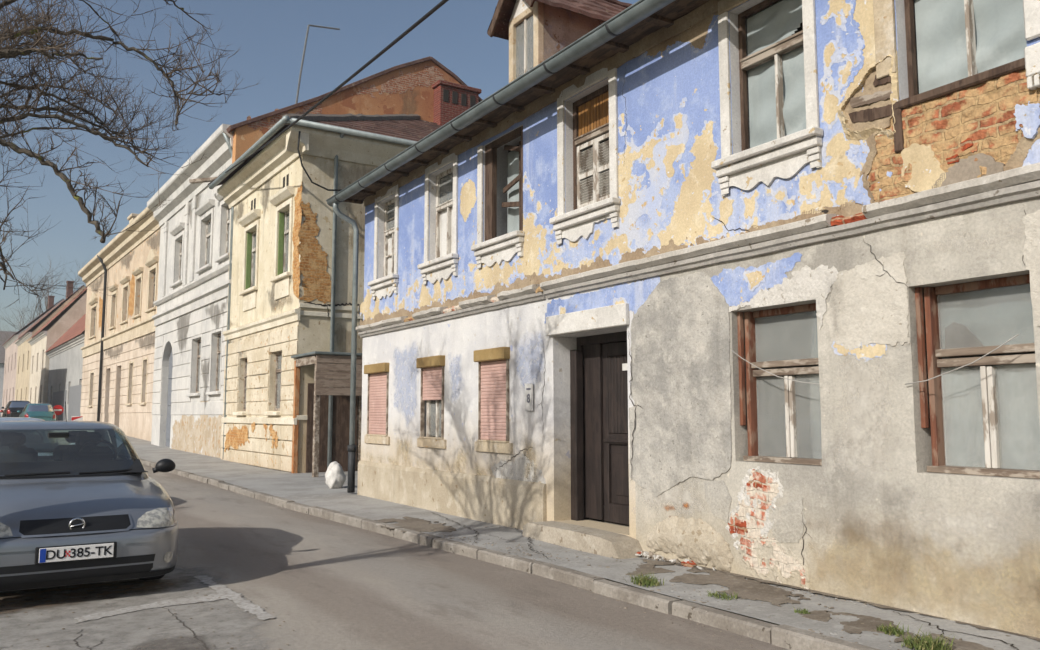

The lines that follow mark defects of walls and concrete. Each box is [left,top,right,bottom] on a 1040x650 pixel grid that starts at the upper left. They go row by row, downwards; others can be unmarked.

spalling [247,102,322,131]
spalling [351,0,1040,326]
spalling [292,184,331,303]
spalling [725,466,812,591]